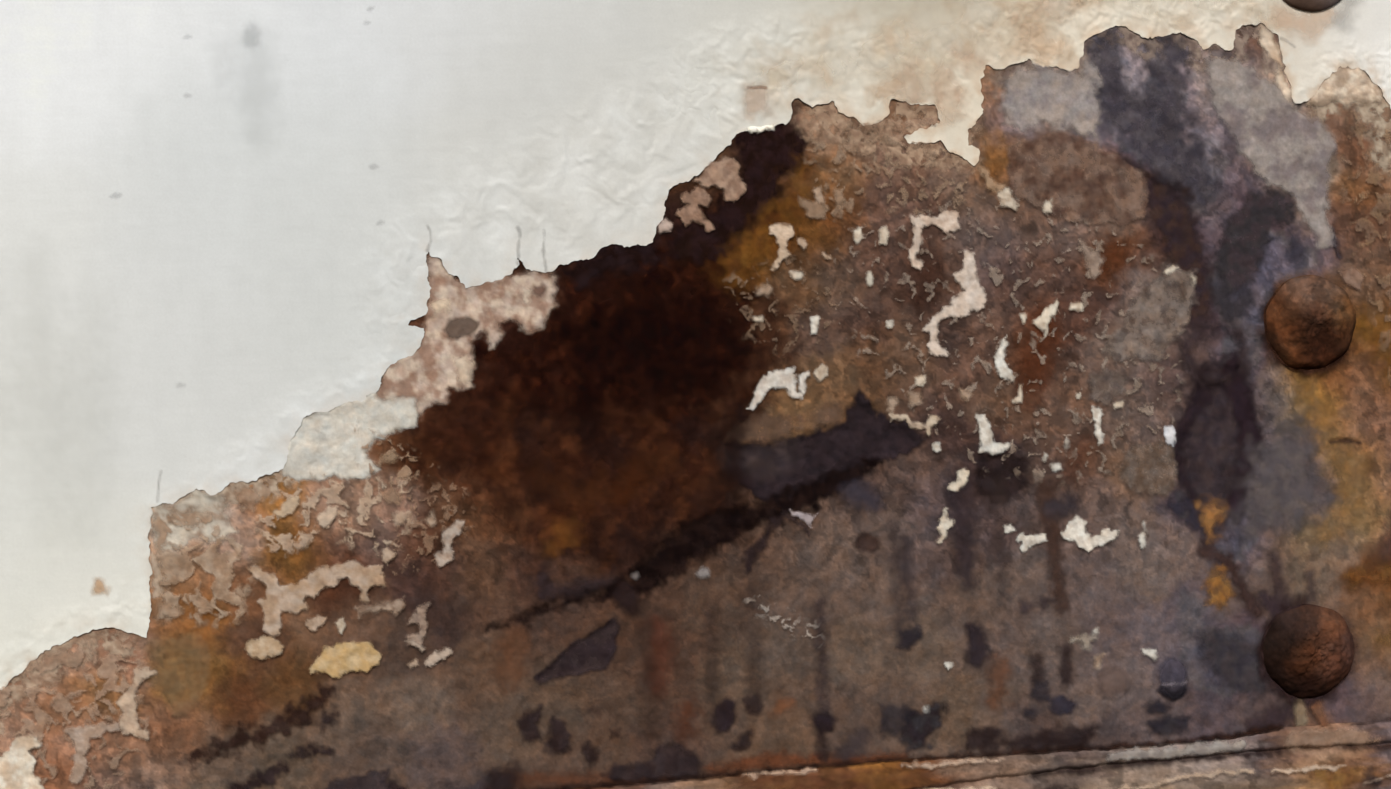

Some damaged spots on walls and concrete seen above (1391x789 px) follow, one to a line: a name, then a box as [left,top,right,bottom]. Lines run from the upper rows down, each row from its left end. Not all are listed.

peeling [694,132,746,201]
corrosion [408,124,813,555]
peeling [747,368,810,410]
peeling [923,250,986,356]
water stain [1087,28,1316,616]
spalling [734,390,924,502]
water stain [950,479,972,584]
water stain [1021,478,1078,612]
peeling [1061,516,1117,551]
water stain [188,686,338,789]
peeling [310,642,381,677]
water stain [459,600,1338,789]